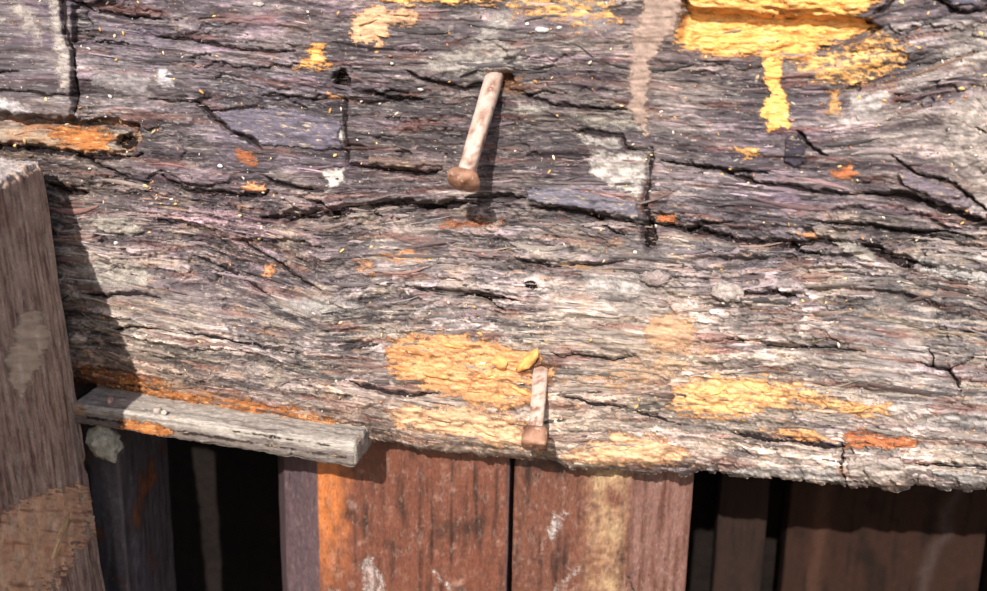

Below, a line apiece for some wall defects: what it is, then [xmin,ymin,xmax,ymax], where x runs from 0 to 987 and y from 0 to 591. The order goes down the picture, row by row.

crack [0,0,296,109]
rust [33,120,115,153]
crack [152,70,481,176]
crack [0,144,144,176]
crack [49,183,89,195]
crack [164,91,987,268]
rust [521,355,559,392]
crack [917,350,973,387]
rust [80,365,346,424]
rust [120,417,177,437]